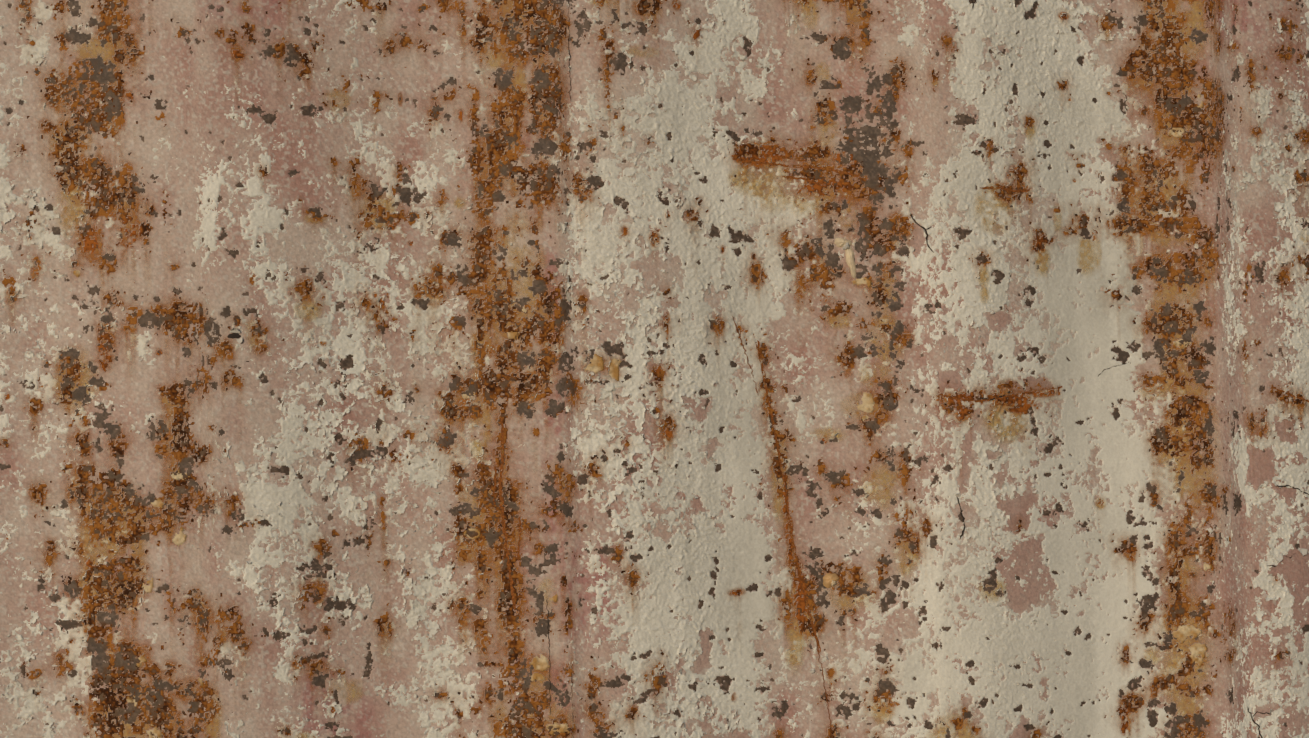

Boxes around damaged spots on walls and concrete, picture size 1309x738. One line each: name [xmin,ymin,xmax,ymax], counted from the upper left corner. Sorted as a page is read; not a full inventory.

corrosion [206,0,325,82]
peeling [574,130,612,204]
corrosion [290,267,326,319]
peeling [709,224,755,257]
corrosion [2,0,283,738]
corrosion [722,102,1066,650]
corrosion [1029,0,1309,738]
peeling [326,418,405,471]
peeling [228,465,377,738]
corrosion [318,497,390,571]
peeling [880,417,1071,738]
peeling [673,627,735,735]